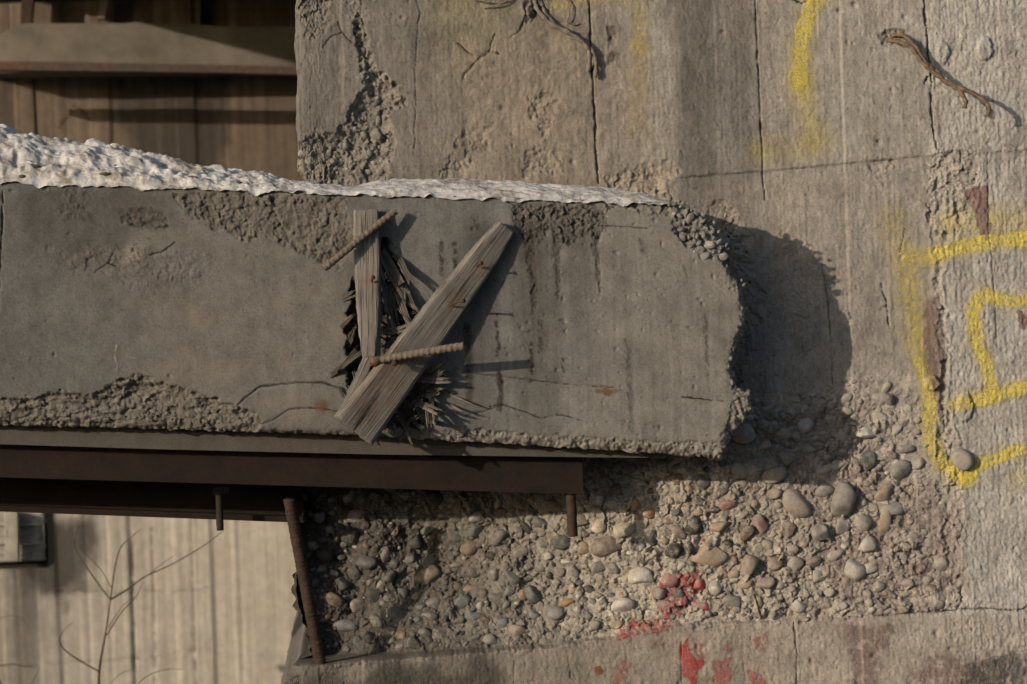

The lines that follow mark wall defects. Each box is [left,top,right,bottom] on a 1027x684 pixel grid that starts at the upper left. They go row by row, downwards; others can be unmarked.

crack [923,0,937,149]
spalling [172,0,408,271]
spalling [435,122,496,179]
crack [0,183,8,272]
spalling [0,372,349,435]
crack [218,382,338,424]
spalling [285,150,991,684]